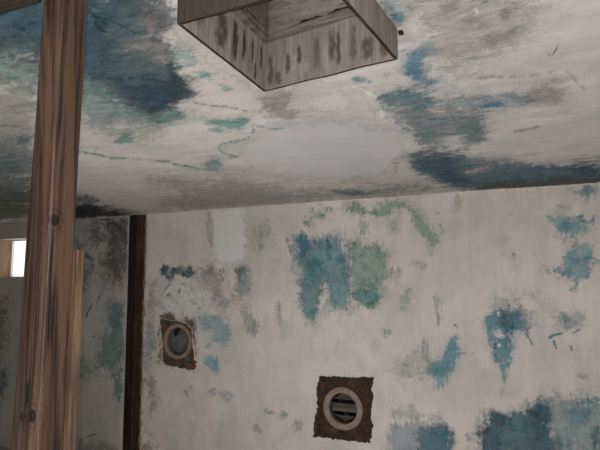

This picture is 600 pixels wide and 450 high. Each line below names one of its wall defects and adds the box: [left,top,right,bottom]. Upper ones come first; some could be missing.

leakage [0,0,44,219]
leakage [82,0,196,144]
crack [79,130,254,171]
leakage [160,45,600,320]
leakage [75,195,129,285]
leakage [97,303,124,402]
peeling [156,279,213,373]
leakage [396,336,461,389]
leakage [485,305,533,384]
spalling [313,375,374,443]
leakage [387,404,454,450]
leakage [465,396,600,450]